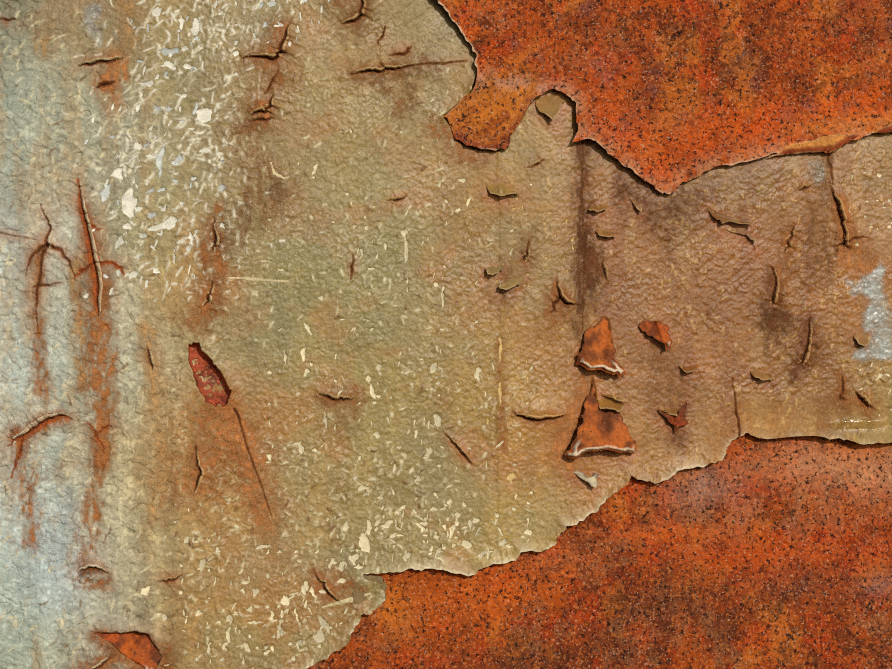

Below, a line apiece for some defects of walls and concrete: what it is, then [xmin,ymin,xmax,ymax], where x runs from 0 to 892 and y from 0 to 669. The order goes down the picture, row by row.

crack [241,25,290,122]
crack [350,27,467,75]
peeling [437,0,892,194]
crack [1,179,124,329]
corrosion [34,311,49,397]
corrosion [15,417,70,544]
crack [9,412,110,478]
corrosion [70,218,118,590]
peeling [565,382,637,459]
peeling [180,476,513,669]
corrosion [307,433,892,669]
peeling [94,631,170,669]